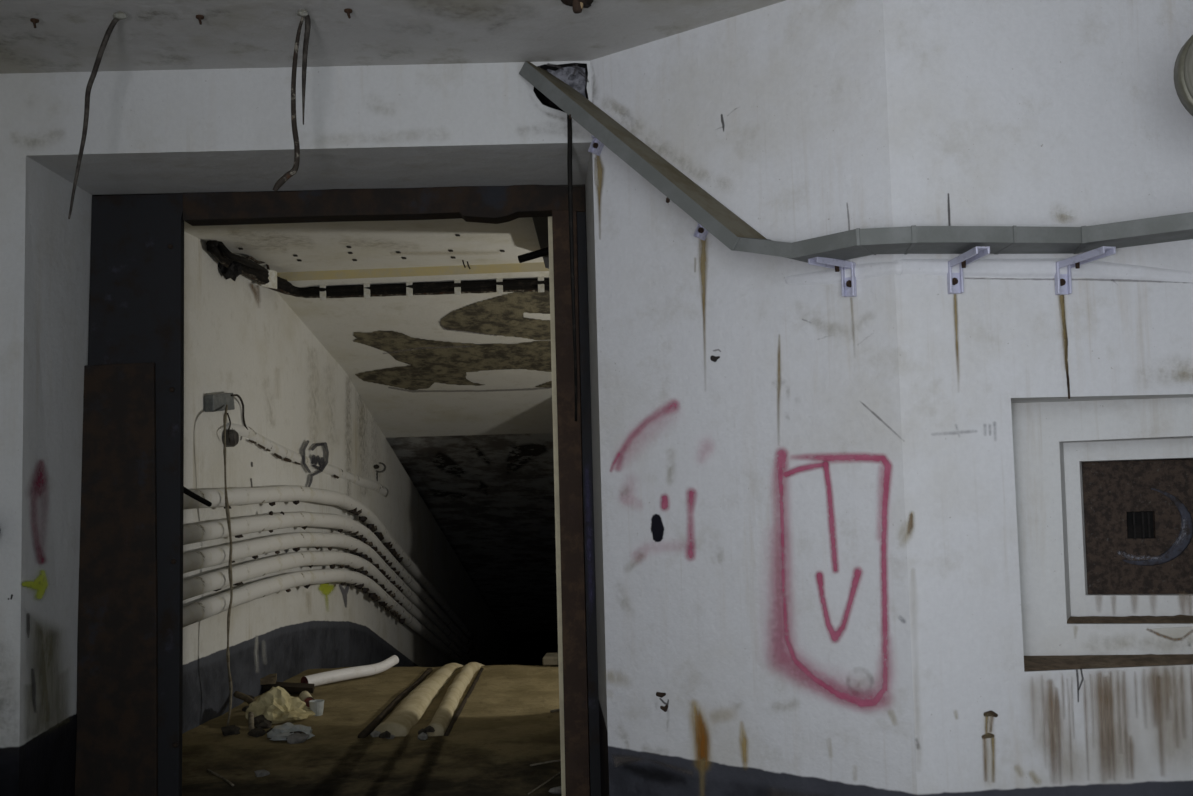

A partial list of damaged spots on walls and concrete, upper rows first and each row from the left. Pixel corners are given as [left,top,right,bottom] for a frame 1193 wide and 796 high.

spalling [533,87,564,112]
spalling [537,63,589,99]
peeling [353,291,552,390]
rust [1059,295,1070,399]
rust [693,706,708,786]
rust [982,711,998,777]